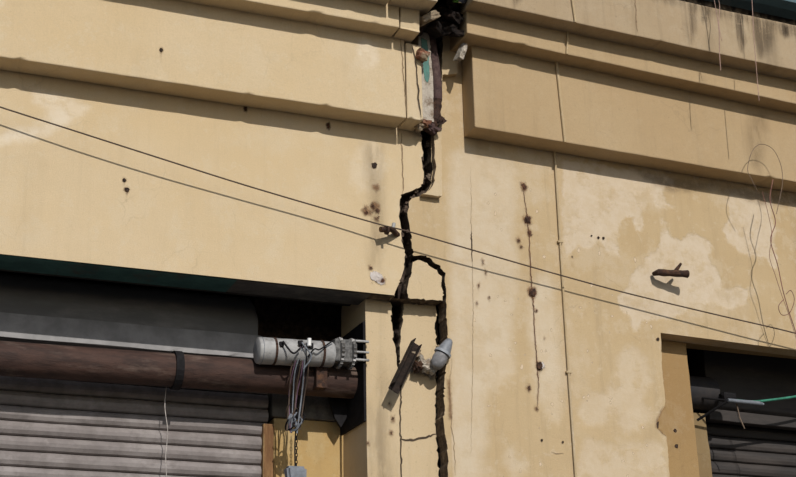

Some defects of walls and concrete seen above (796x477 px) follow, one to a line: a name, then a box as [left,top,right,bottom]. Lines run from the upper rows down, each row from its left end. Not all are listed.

crack [400,39,421,114]
spalling [416,0,465,82]
damp [754,21,770,53]
crack [387,133,444,364]
crack [467,167,475,283]
rust [518,183,545,410]
peeling [441,133,796,477]
crack [399,367,473,477]